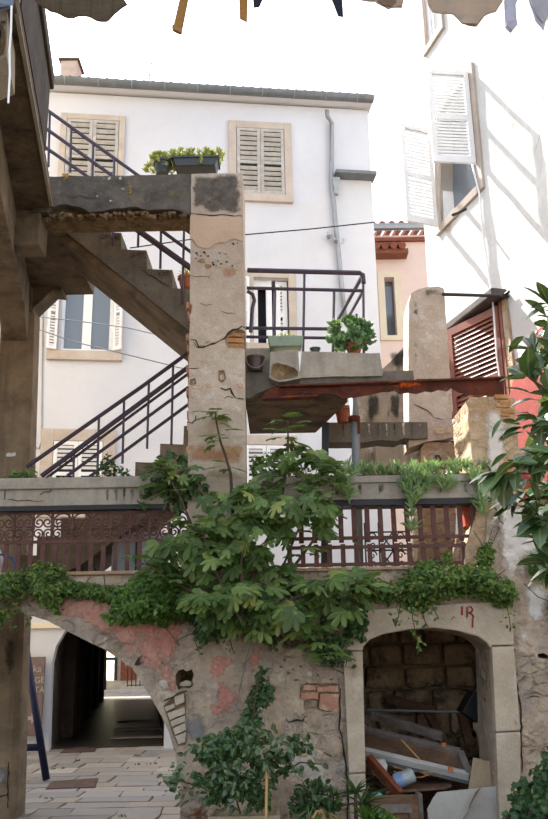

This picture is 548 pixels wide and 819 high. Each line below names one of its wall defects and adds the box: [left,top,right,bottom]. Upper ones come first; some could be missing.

flaking render [45,210,242,268]
crack [190,303,245,348]
water stain [390,350,404,365]
water stain [368,396,412,434]
spalling [280,659,339,712]
flaking render [289,739,338,800]